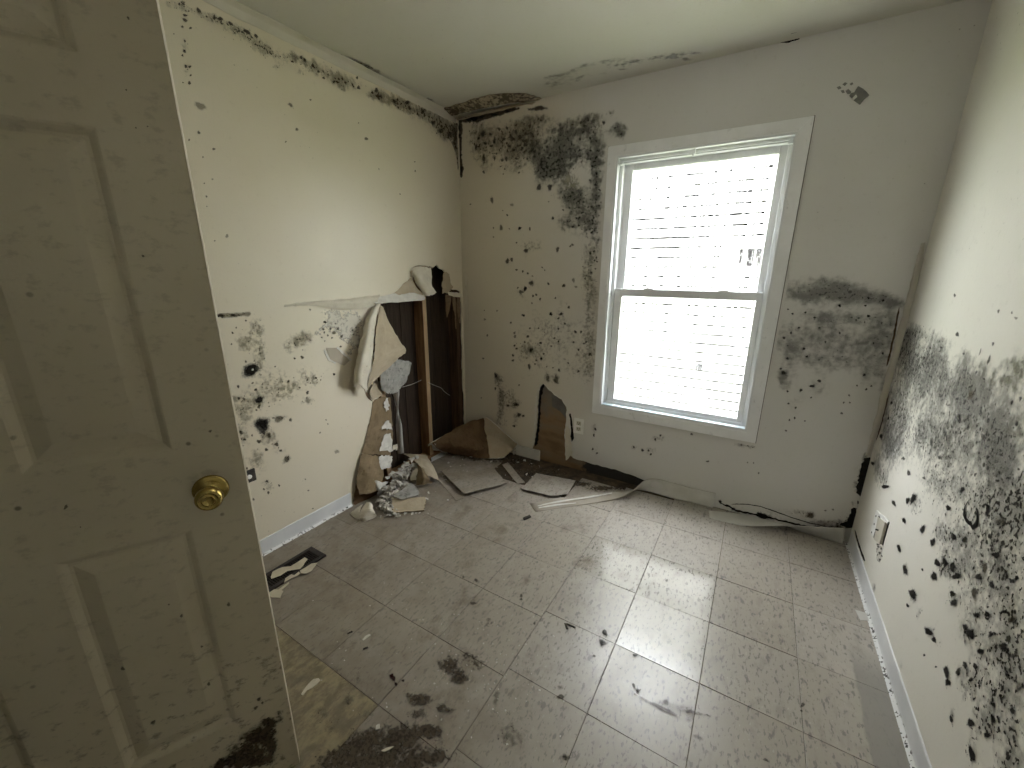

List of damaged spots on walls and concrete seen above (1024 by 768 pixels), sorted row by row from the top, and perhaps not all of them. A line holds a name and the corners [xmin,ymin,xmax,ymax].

damp [167,1,626,382]
mould [217,312,335,469]
hole [384,301,422,469]
flaking render [532,383,574,446]
mould [780,278,900,431]
crack [719,500,843,528]
mould [875,326,1024,768]